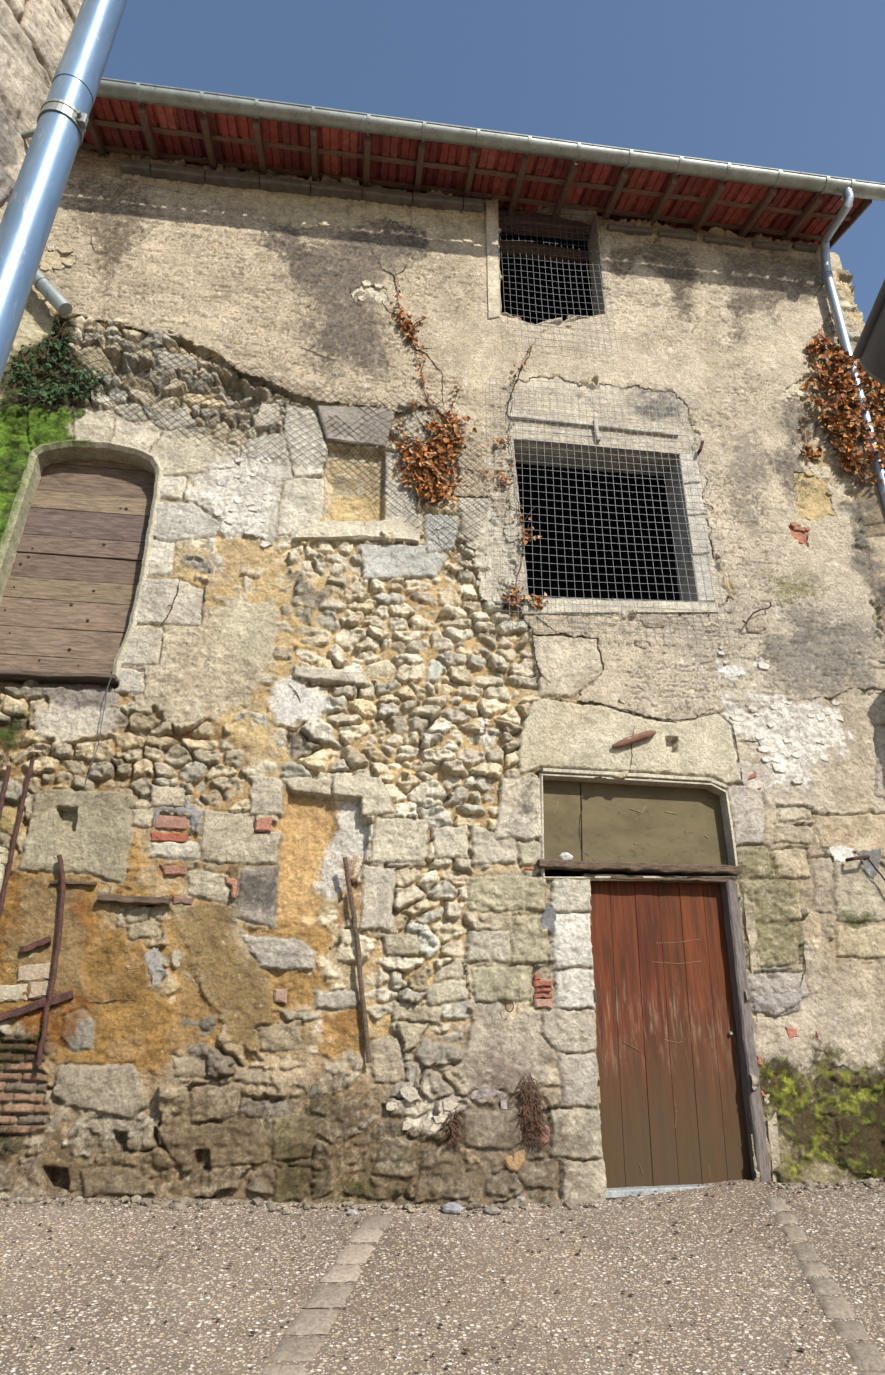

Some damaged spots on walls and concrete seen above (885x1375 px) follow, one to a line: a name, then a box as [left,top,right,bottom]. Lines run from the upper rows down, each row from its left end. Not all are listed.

leakage [70,176,160,290]
leakage [260,219,428,377]
leakage [611,237,820,421]
crack [505,347,532,416]
peeling [198,450,284,548]
spalling [466,506,520,606]
crack [531,615,556,683]
peeling [475,716,495,751]
rust [16,988,94,1046]
peeling [386,1082,459,1136]
leakage [758,1057,795,1107]